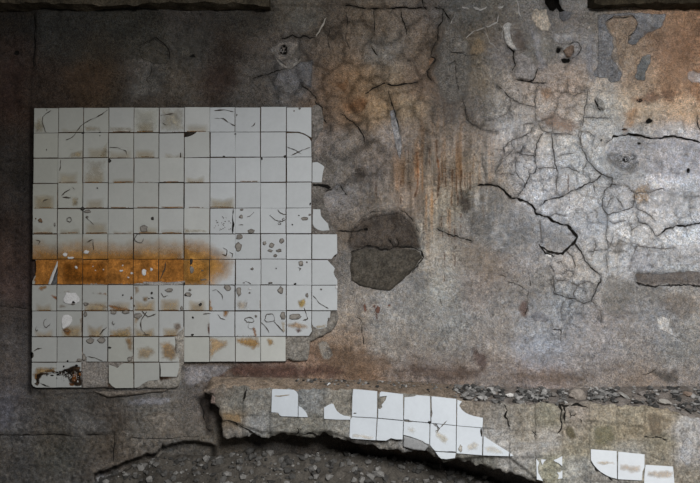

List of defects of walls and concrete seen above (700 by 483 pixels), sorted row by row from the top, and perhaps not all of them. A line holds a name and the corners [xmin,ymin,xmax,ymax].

crack [281,0,700,341]
spalling [349,212,419,249]
corrosion [33,246,226,290]
spalling [636,271,700,286]
peeling [46,354,86,383]
crack [0,403,255,461]